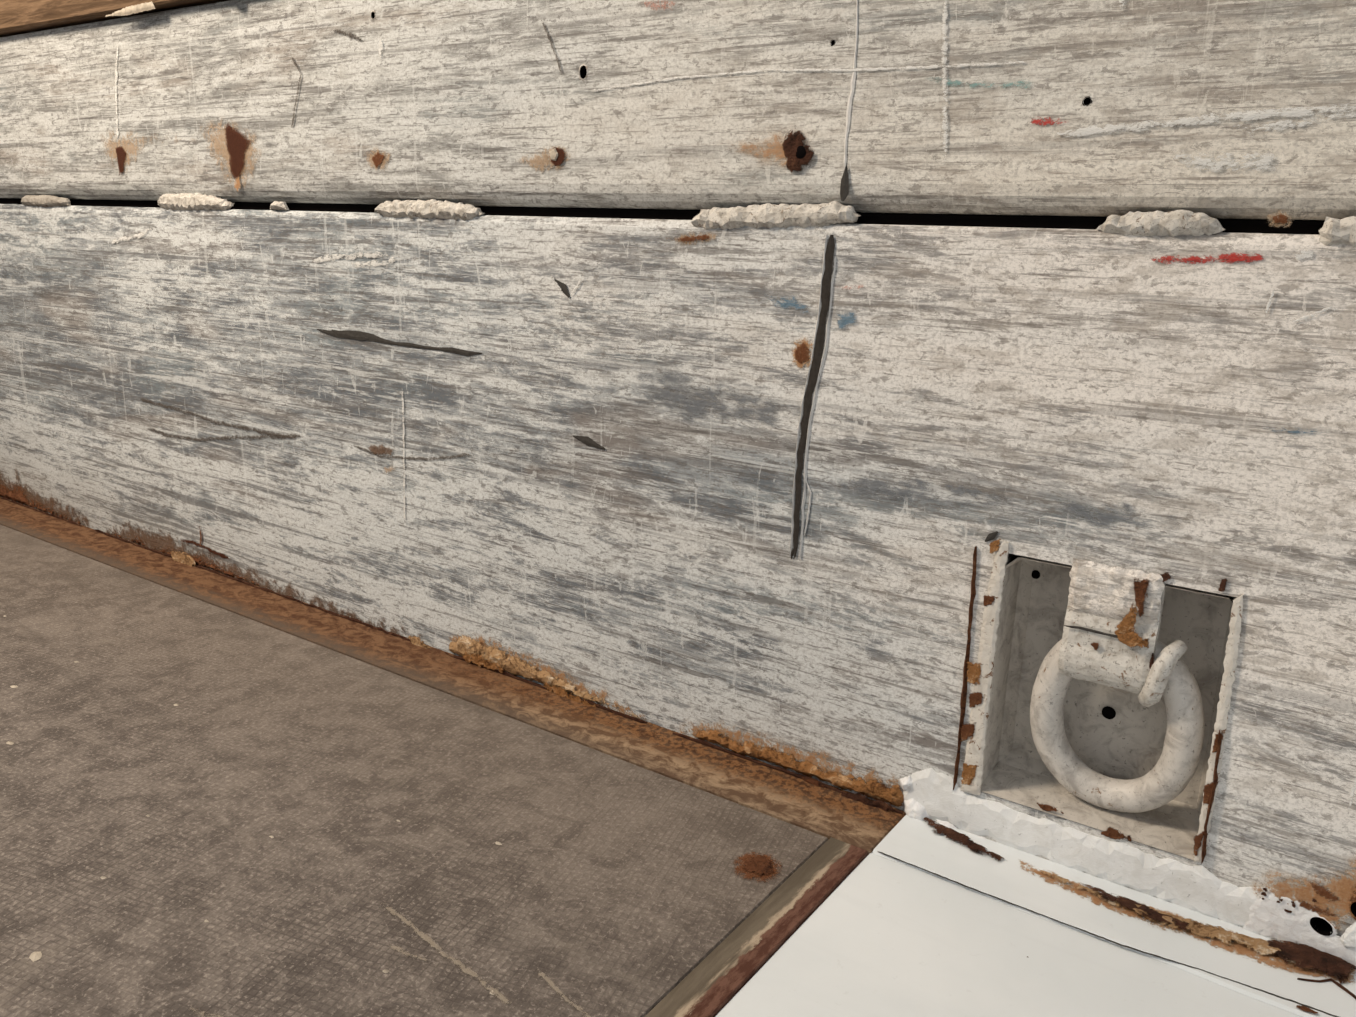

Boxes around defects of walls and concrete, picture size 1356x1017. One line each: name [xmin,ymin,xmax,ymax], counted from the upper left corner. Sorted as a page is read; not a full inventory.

rust [208,122,257,191]
rust [741,130,814,173]
crack [840,0,858,201]
crack [790,235,836,559]
rust [953,546,977,790]
rust [924,817,1004,861]
rust [1020,860,1356,983]